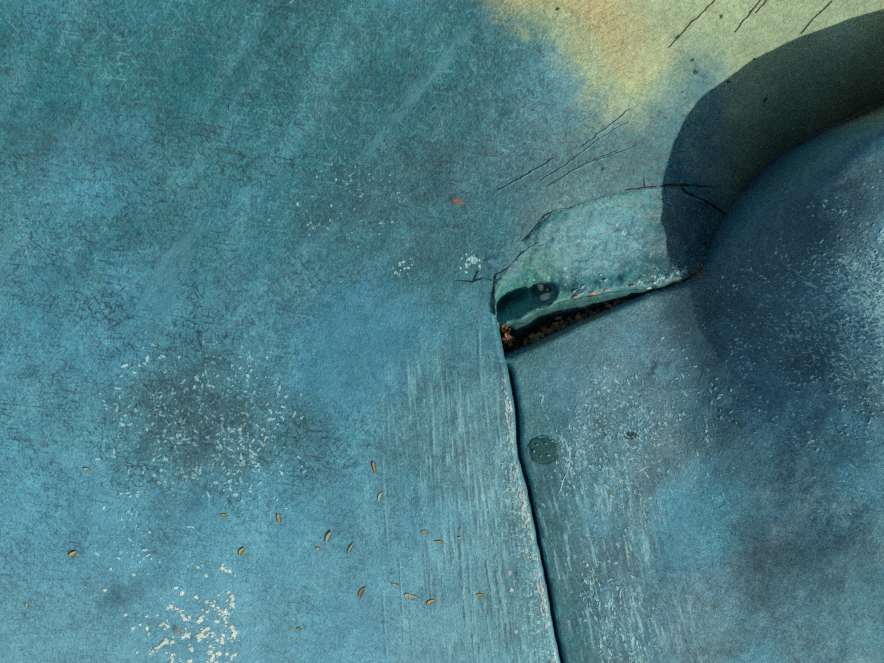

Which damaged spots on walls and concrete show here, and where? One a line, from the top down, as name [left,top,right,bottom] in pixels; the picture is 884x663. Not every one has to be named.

crack [626,181,734,229]
crack [457,208,564,315]